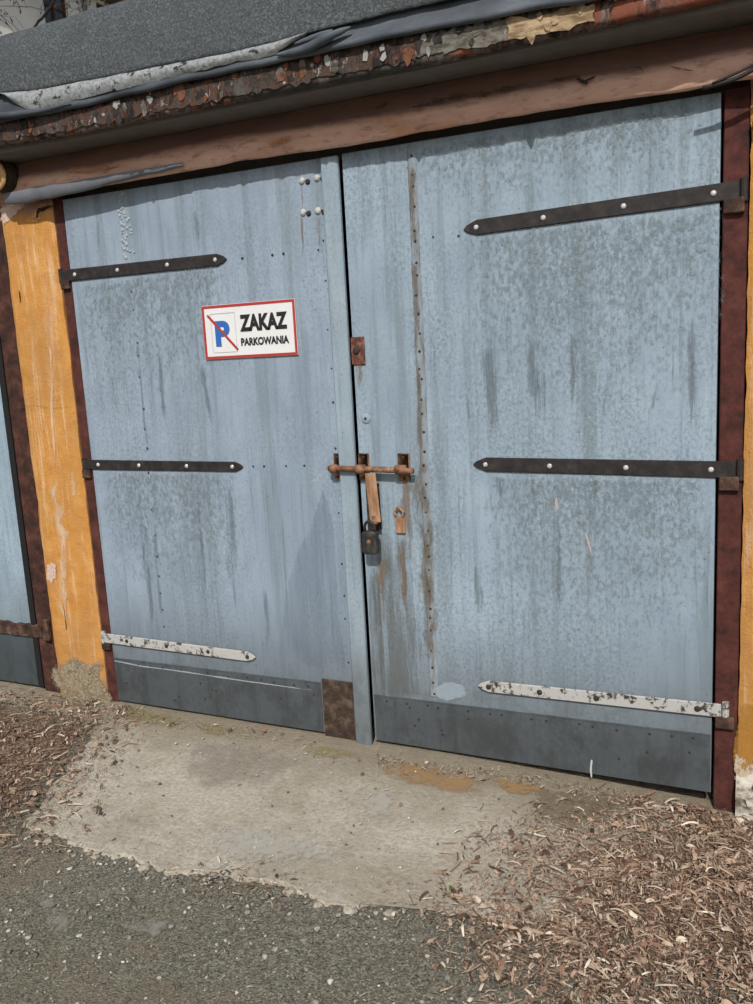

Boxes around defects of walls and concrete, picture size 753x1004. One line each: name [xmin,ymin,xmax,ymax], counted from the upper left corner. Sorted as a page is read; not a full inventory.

peeling [0,4,595,141]
peeling [52,657,112,703]
spalling [734,754,753,825]